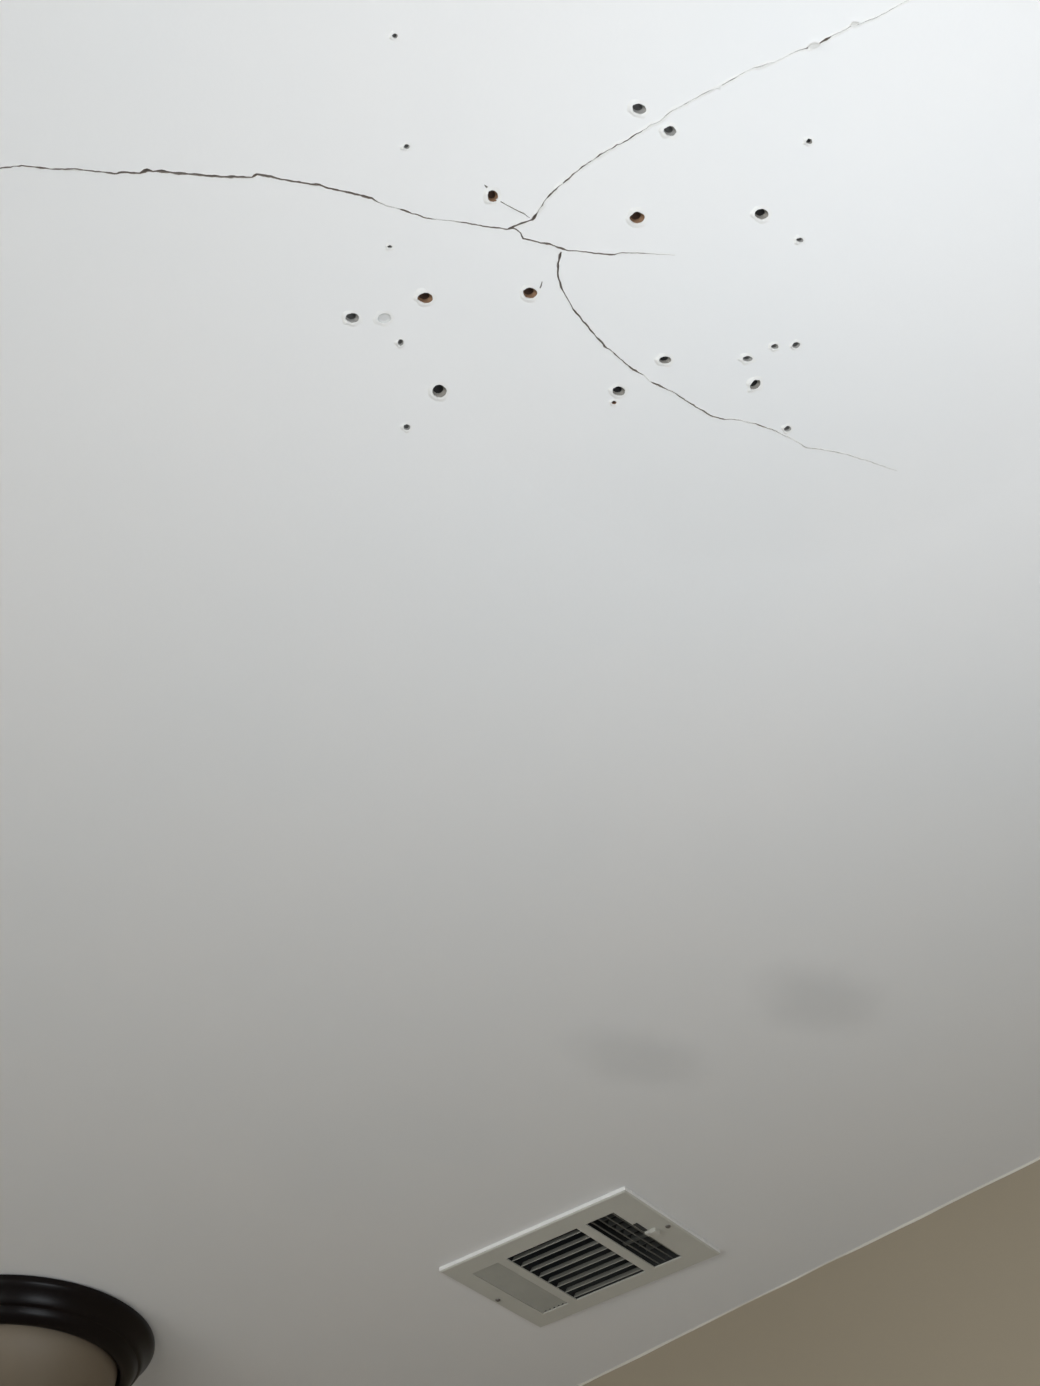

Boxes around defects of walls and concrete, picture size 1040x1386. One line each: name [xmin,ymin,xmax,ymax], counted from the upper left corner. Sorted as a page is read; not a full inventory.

crack [0,0,913,471]